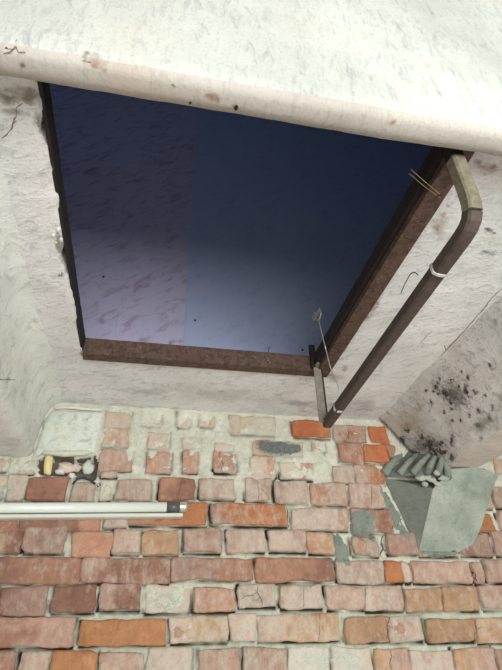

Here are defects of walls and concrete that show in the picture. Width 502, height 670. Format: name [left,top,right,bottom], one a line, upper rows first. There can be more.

damp [425,370,487,414]
flaking render [33,406,104,481]
damp [412,434,454,461]